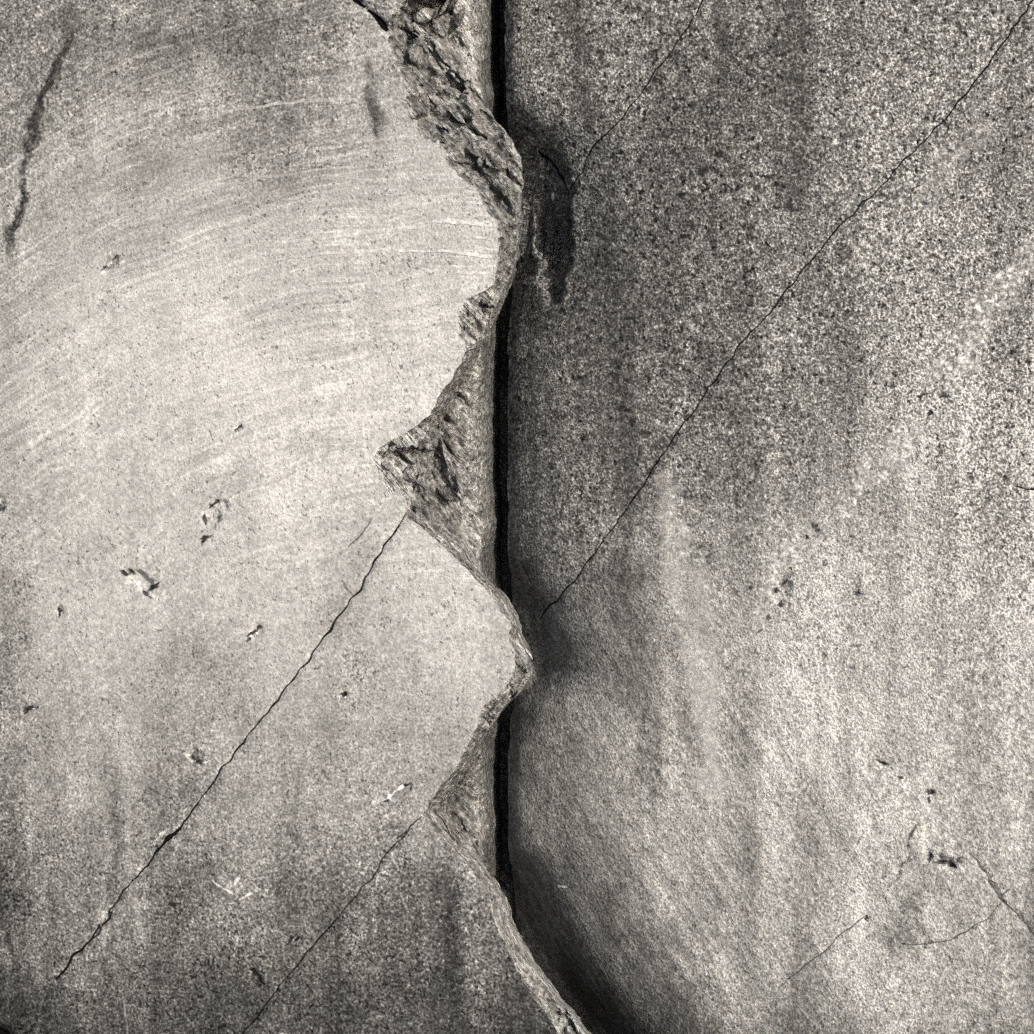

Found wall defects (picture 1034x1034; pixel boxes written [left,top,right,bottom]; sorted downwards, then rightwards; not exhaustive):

crack [353,0,389,31]
crack [56,514,406,981]
crack [242,817,421,1034]
spalling [373,0,591,1034]
crack [538,0,1034,620]